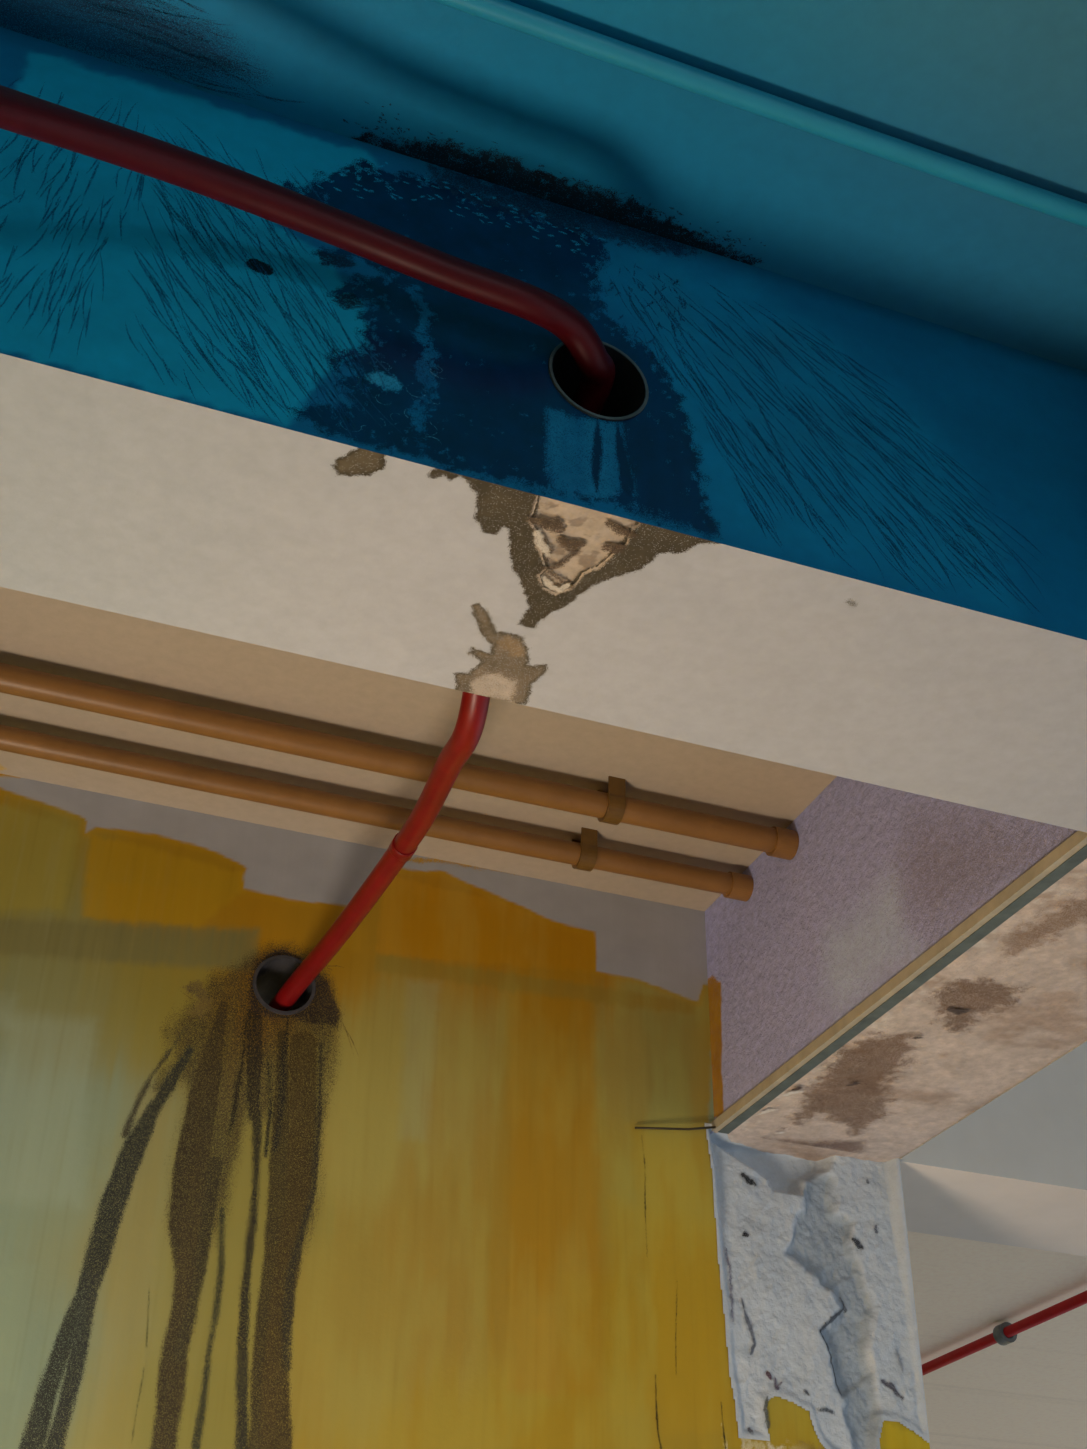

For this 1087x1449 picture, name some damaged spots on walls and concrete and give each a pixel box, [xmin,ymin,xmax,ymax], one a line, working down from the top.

leakage [0,0,310,105]
leakage [275,103,766,541]
flaking render [427,468,721,705]
leakage [18,938,359,1449]
flaking render [705,1123,930,1449]